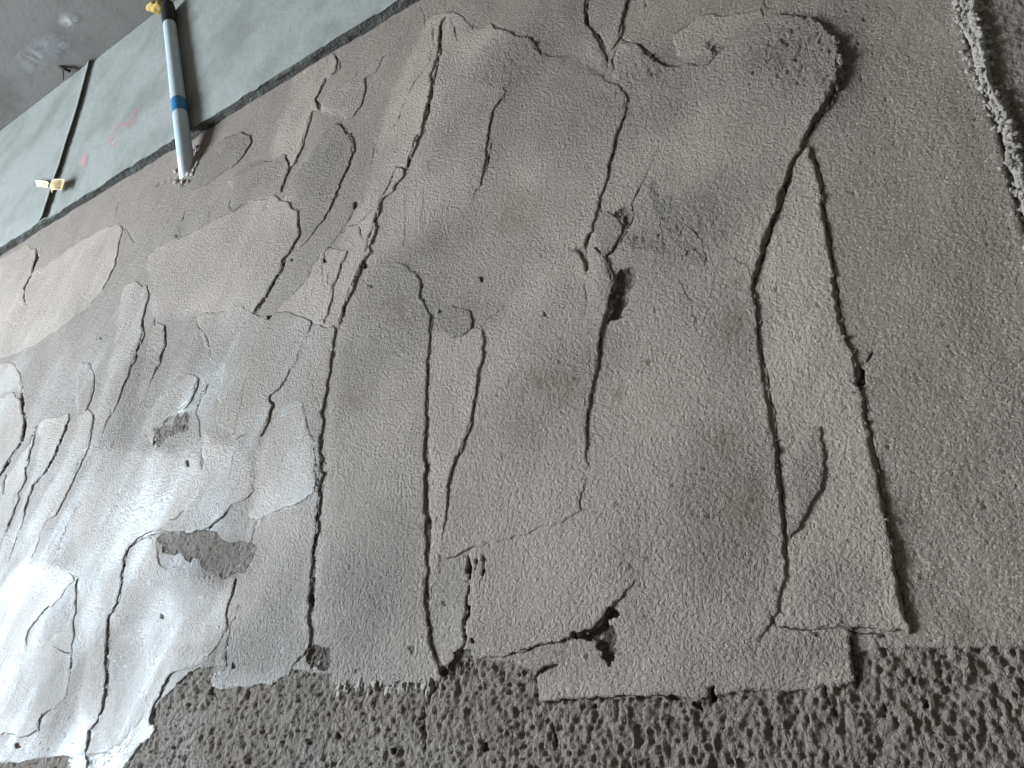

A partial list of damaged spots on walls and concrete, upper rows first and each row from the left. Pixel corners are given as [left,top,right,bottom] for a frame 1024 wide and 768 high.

crack [233,1,541,335]
spalling [951,0,1024,264]
crack [569,149,658,449]
crack [0,380,94,531]
crack [105,532,161,684]
spalling [153,412,190,448]
spalling [156,529,255,580]
crack [230,381,326,589]
spalling [305,644,330,672]
crack [422,317,486,667]
spalling [439,638,475,680]
spalling [571,606,620,667]